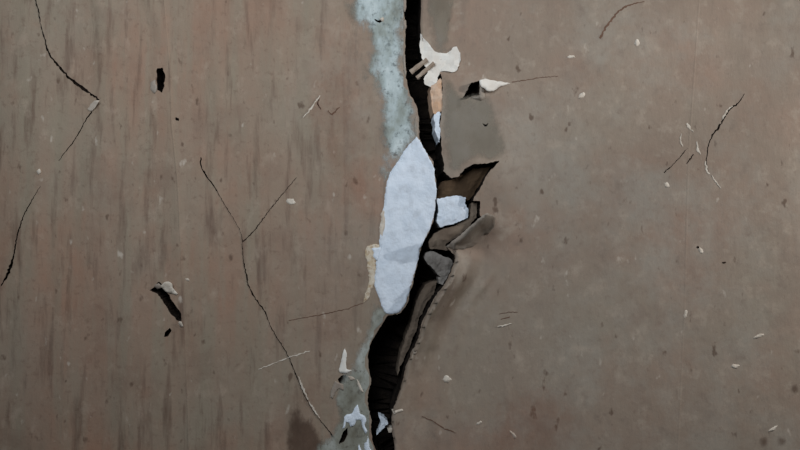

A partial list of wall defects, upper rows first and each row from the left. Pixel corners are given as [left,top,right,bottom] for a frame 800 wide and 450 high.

crack [35,0,99,159]
damp [354,0,414,157]
crack [664,95,744,189]
crack [1,169,41,286]
crack [200,157,334,437]
flaking render [363,137,437,314]
crack [368,0,499,450]
flaking render [339,405,371,450]